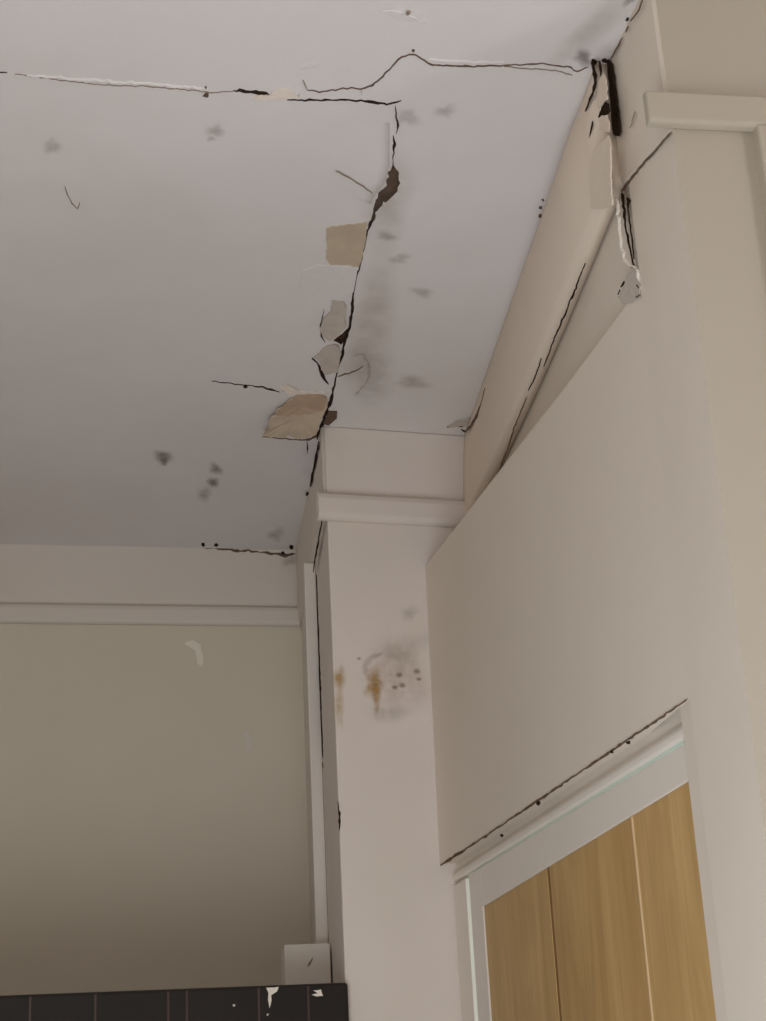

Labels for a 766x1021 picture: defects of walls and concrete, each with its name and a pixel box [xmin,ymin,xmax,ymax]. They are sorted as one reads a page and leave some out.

crack [611,0,643,58]
flaking render [585,58,621,137]
crack [0,49,588,496]
crack [615,193,641,304]
flaking render [263,393,328,440]
crack [440,699,688,866]